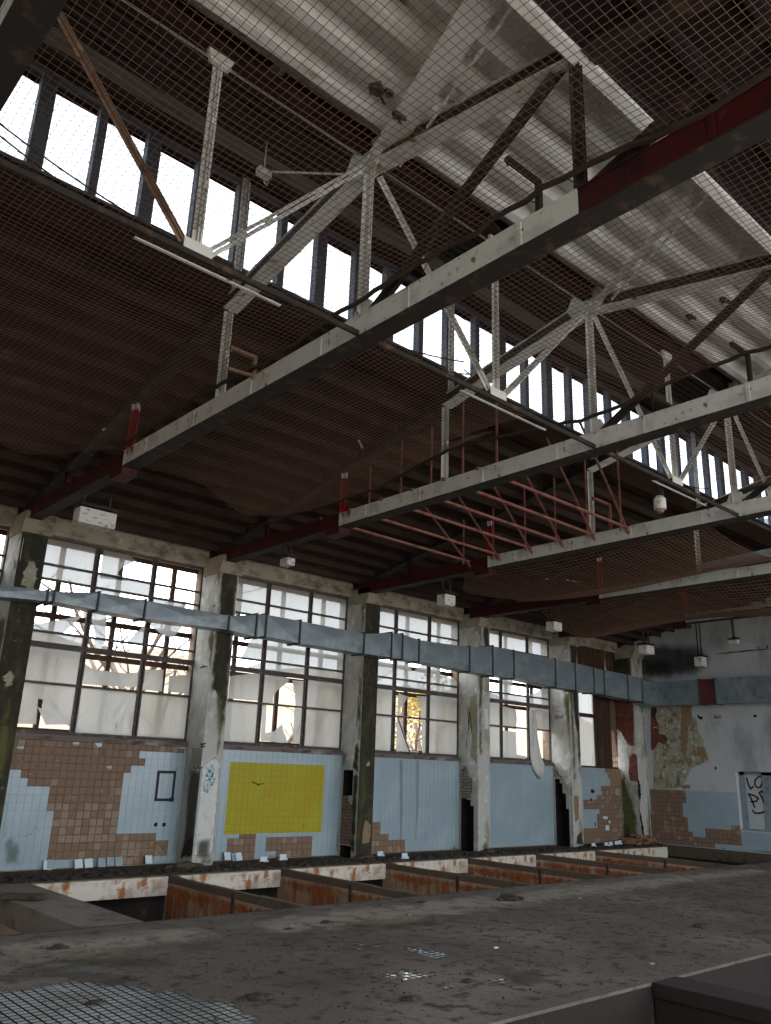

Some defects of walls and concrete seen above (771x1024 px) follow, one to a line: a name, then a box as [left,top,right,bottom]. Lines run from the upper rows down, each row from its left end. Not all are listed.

leakage [13,532,48,590]
leakage [218,573,237,616]
flaking render [604,652,631,675]
leakage [209,631,231,745]
leakage [0,601,37,828]
peeling [10,739,187,865]
flaking render [553,698,744,865]
peeling [226,834,312,862]
peeling [371,822,409,859]
rust [393,852,654,893]
rust [166,887,260,920]